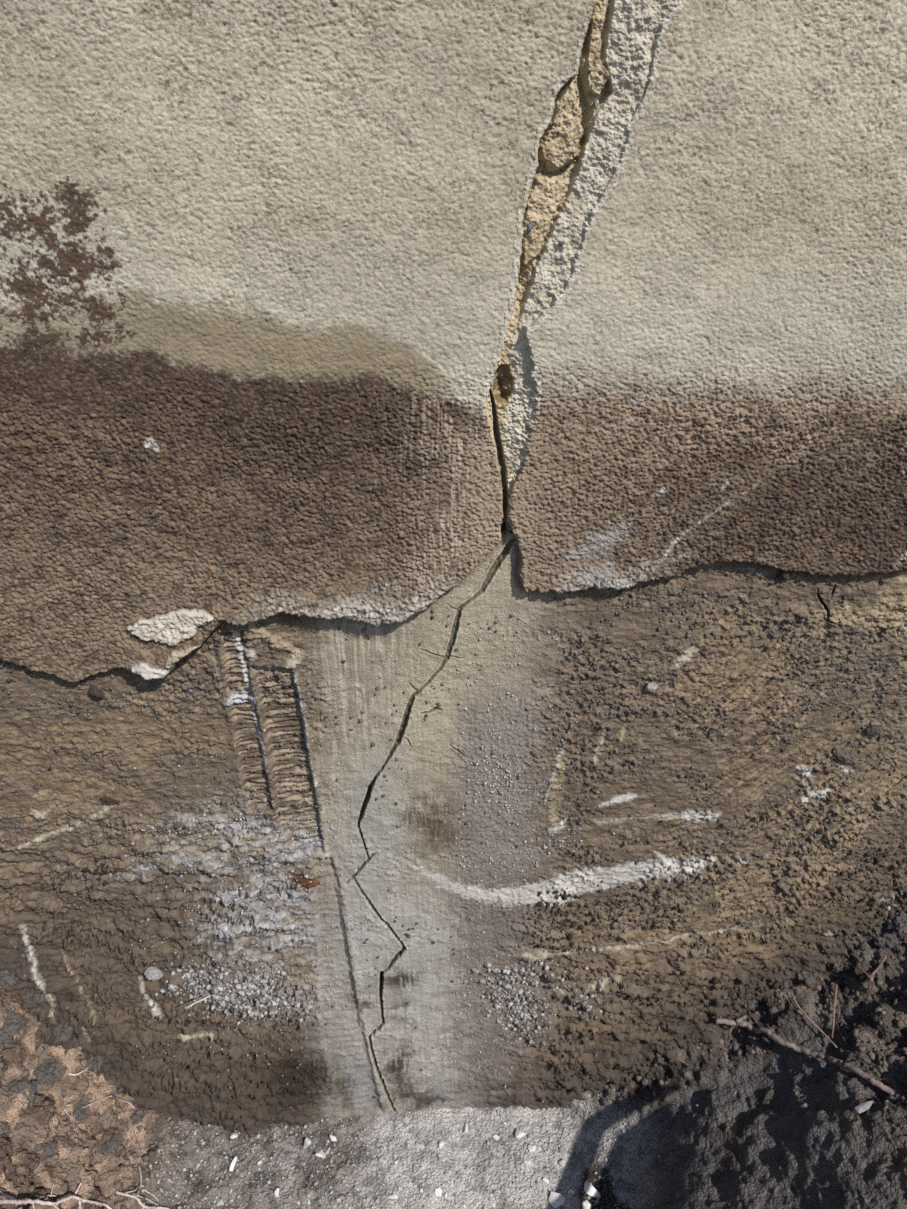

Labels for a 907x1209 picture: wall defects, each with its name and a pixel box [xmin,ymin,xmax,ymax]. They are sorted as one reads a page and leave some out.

water stain [0,176,443,396]
crack [343,0,687,1114]
water stain [565,524,630,581]
water stain [657,481,729,565]
flaking render [127,609,214,680]
flaking render [313,583,408,624]